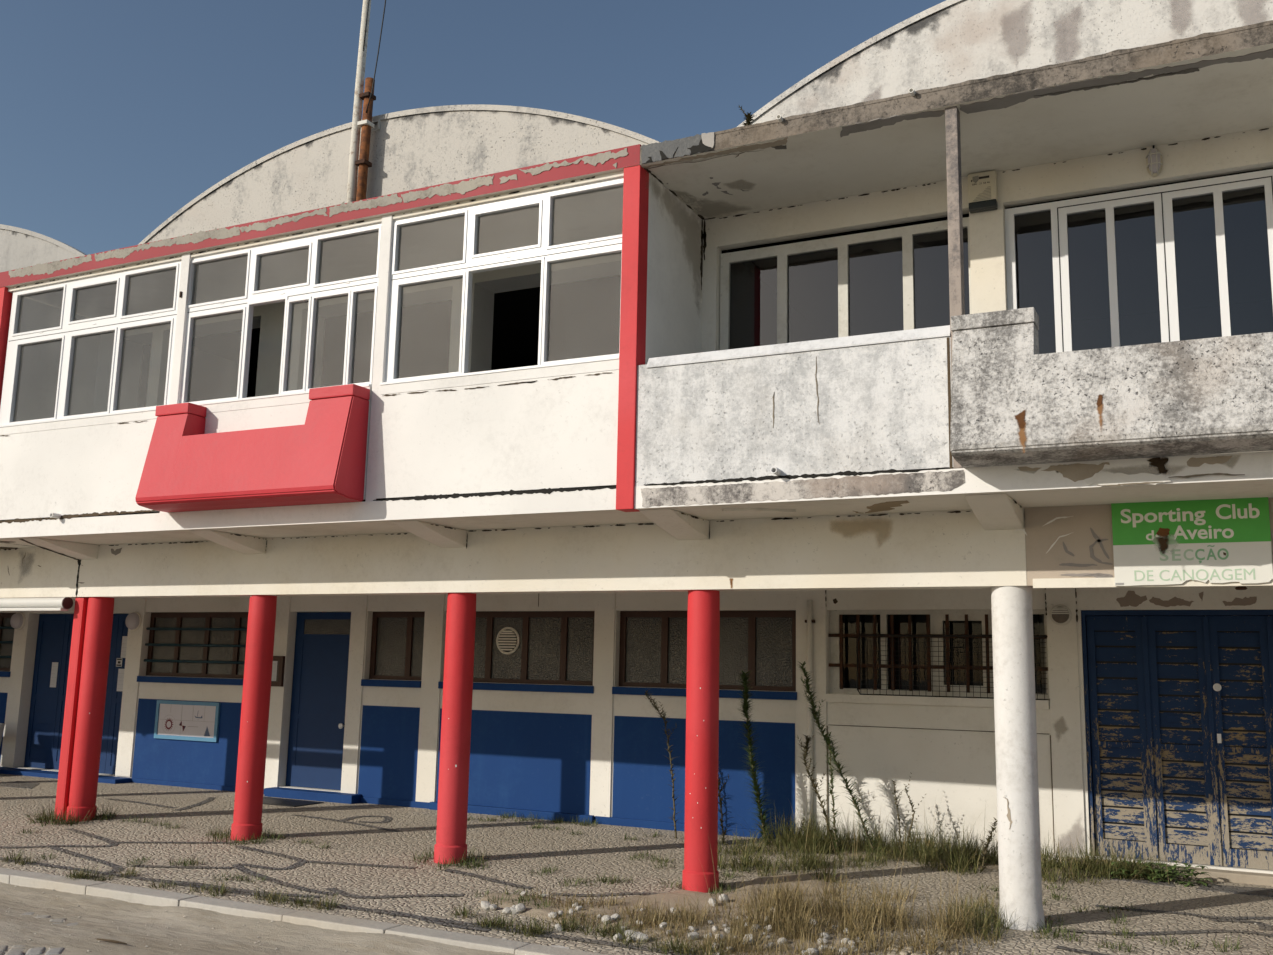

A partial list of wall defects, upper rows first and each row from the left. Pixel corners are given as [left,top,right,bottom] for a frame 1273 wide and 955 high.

water stain [795,6,948,91]
peeling [9,148,629,278]
rust [1015,410,1027,453]
peeling [1018,456,1245,486]
peeling [1116,591,1203,607]
peeling [1223,597,1257,606]